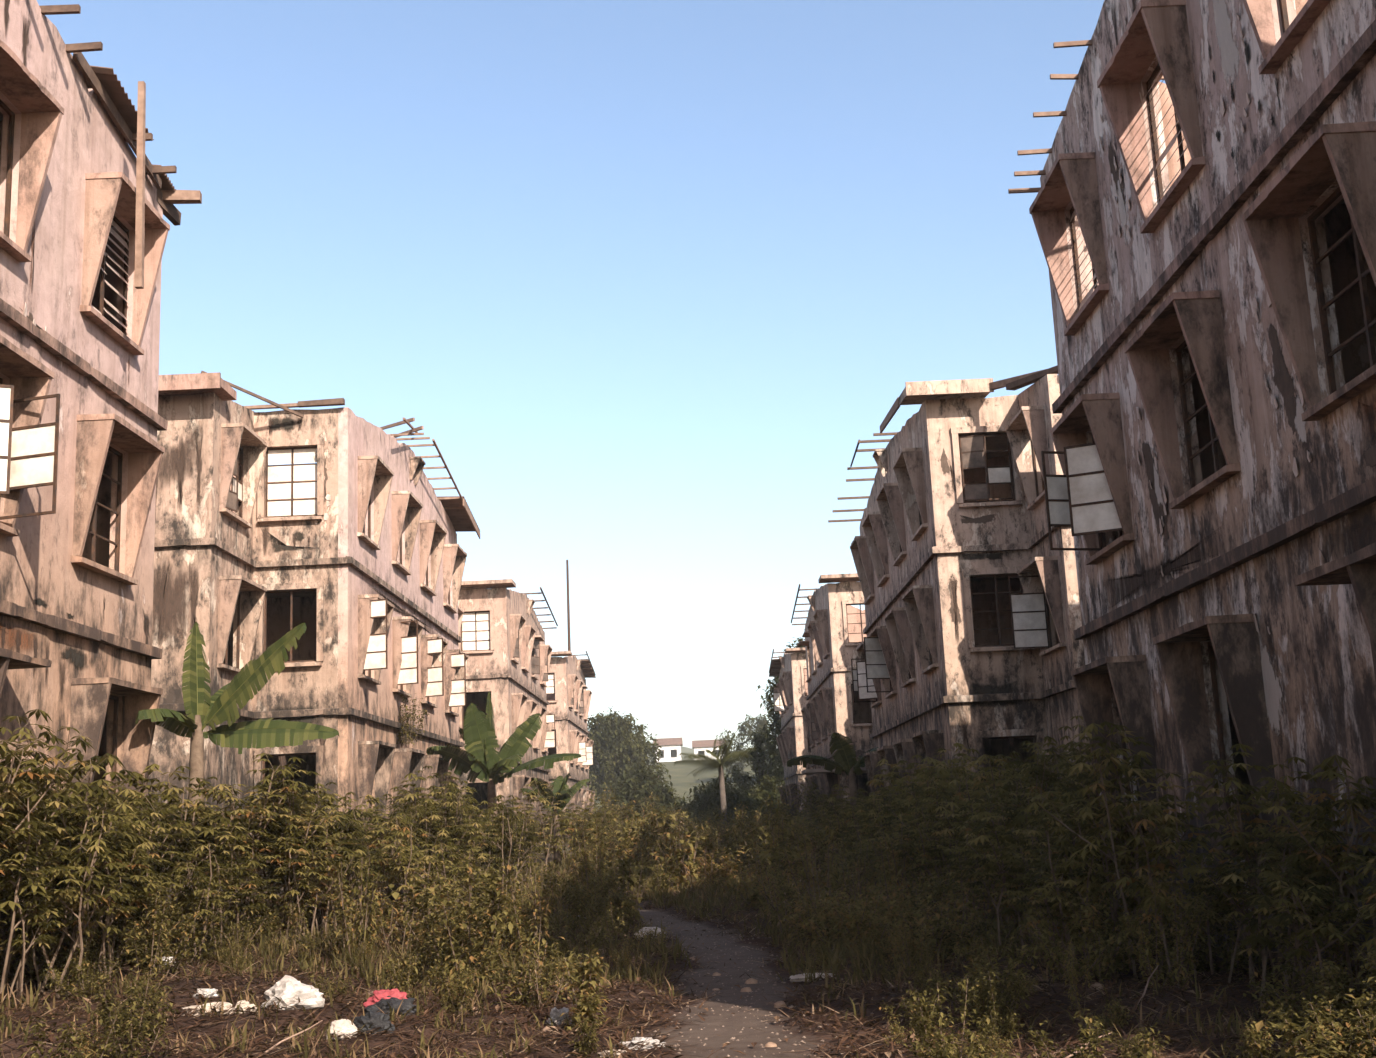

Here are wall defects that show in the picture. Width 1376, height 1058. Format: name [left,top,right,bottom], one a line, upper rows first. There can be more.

damp [155,430,202,516]